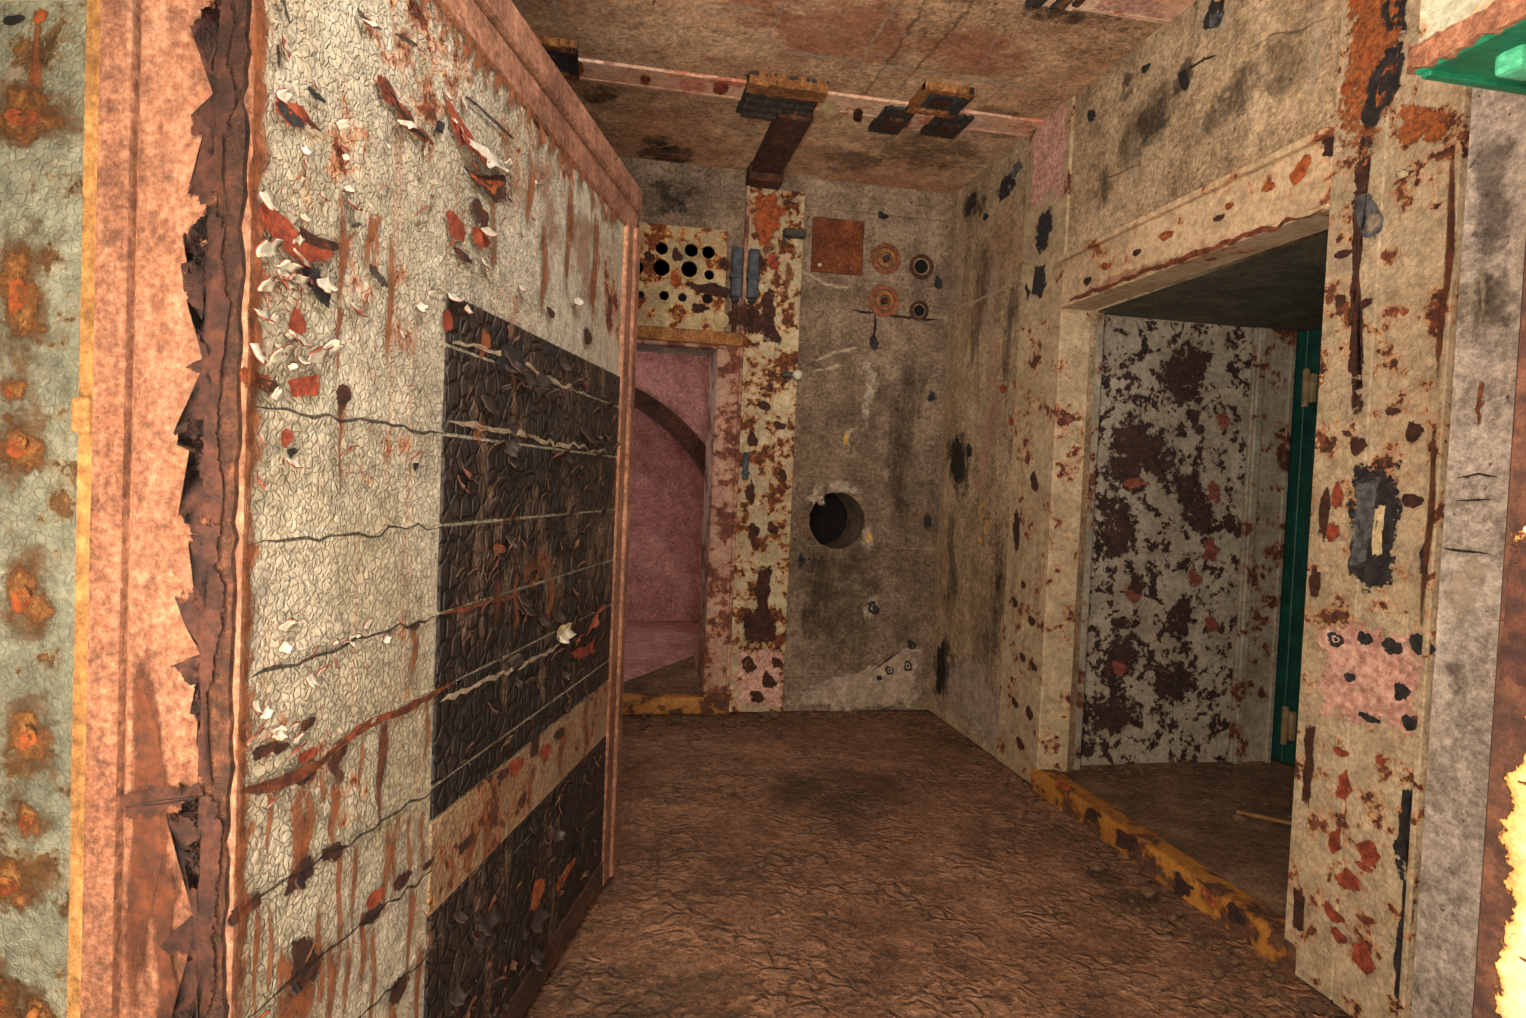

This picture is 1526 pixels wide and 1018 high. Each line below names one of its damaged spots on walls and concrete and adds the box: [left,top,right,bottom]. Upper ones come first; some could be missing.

corrosion [0,9,79,148]
corrosion [0,235,55,482]
peeling [239,80,391,405]
peeling [415,289,474,333]
peeling [396,91,537,269]
corrosion [479,328,491,359]
corrosion [412,0,619,345]
corrosion [752,190,794,294]
peeling [258,428,303,469]
corrosion [233,0,425,1018]
peeling [277,618,298,654]
peeling [305,617,393,689]